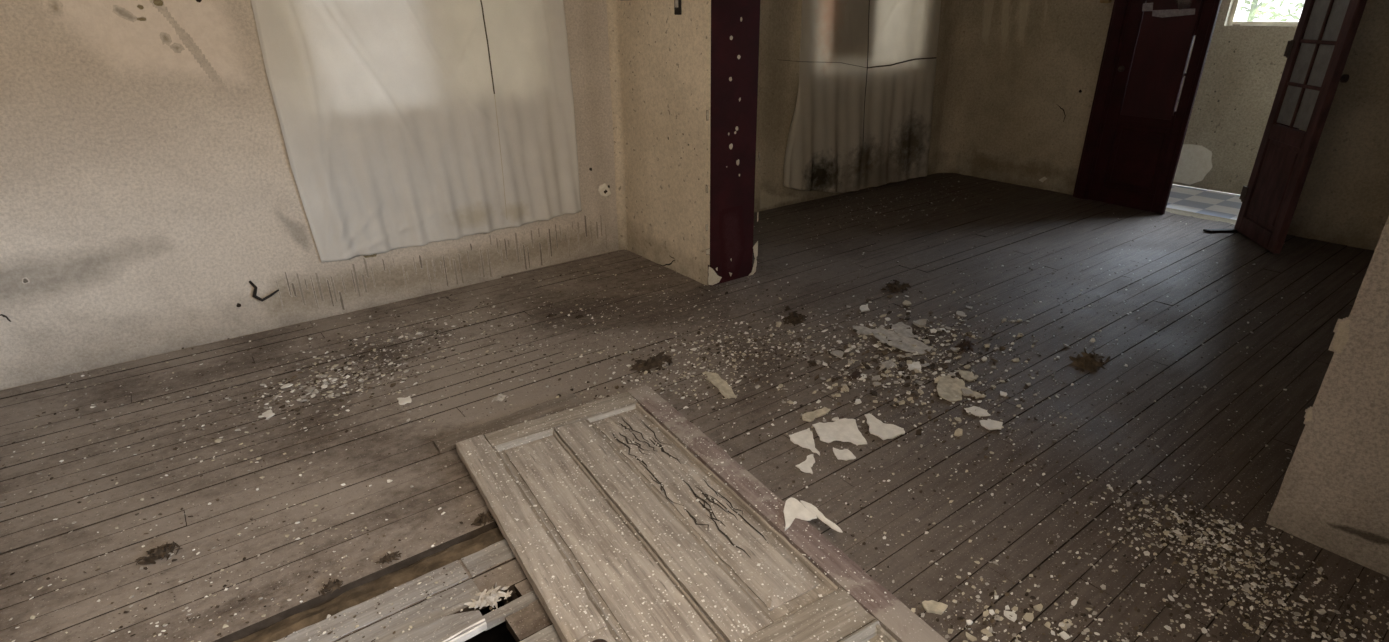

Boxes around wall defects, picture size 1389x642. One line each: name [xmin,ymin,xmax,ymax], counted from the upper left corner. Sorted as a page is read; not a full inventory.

peeling [706,240,758,286]